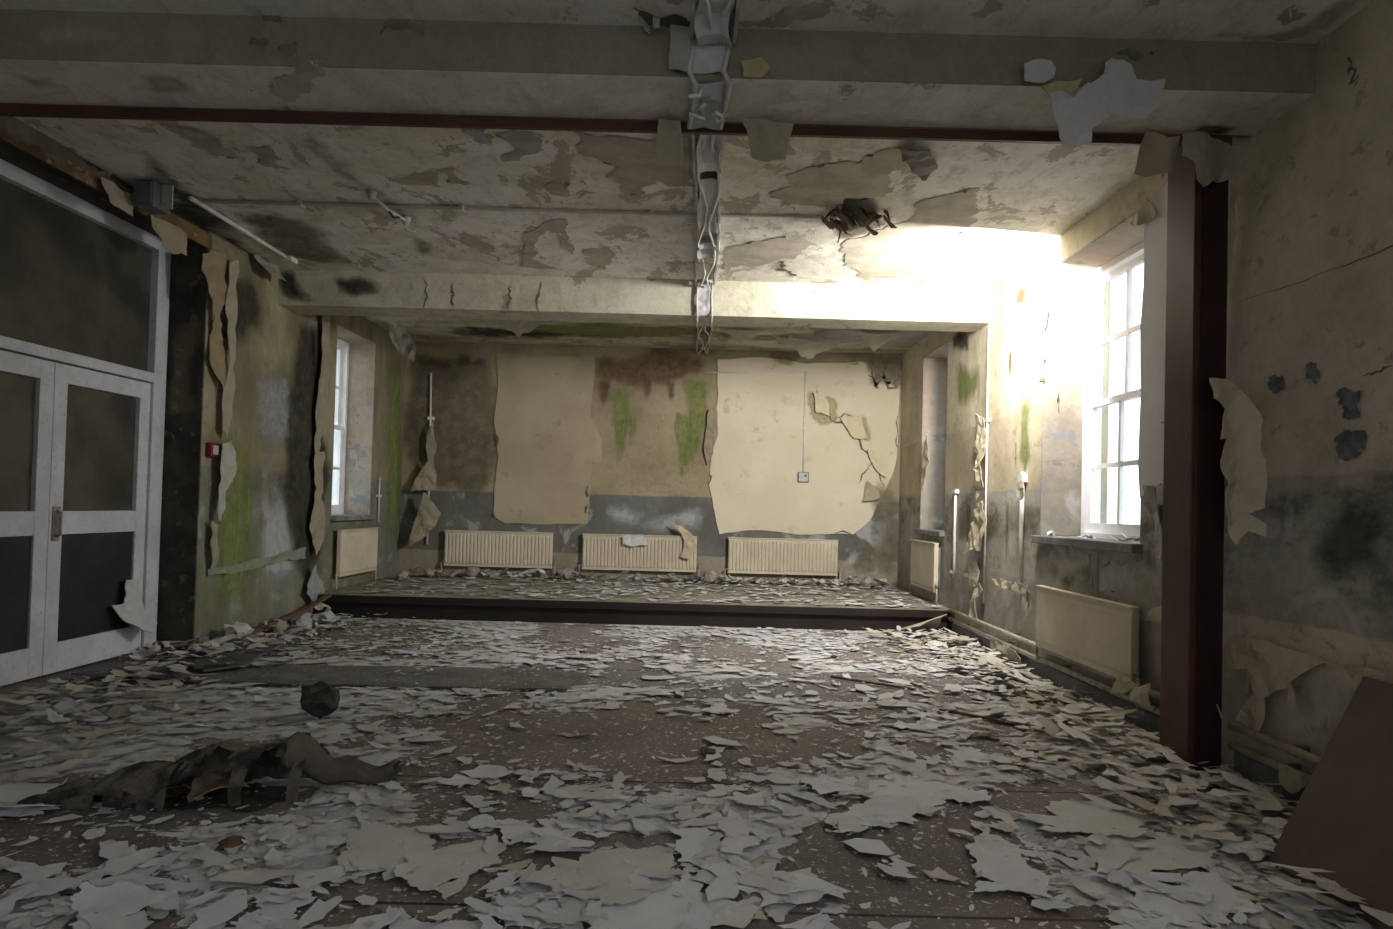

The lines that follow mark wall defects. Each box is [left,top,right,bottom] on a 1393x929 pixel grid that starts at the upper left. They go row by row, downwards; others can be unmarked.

peeling [633,0,690,35]
peeling [0,116,115,180]
peeling [166,127,281,165]
peeling [462,129,545,162]
peeling [574,132,699,196]
peeling [768,138,980,279]
peeling [461,218,616,270]
peeling [719,236,812,277]
water stain [223,281,259,340]
water stain [216,328,330,576]
peeling [493,352,602,525]
peeling [709,329,933,535]